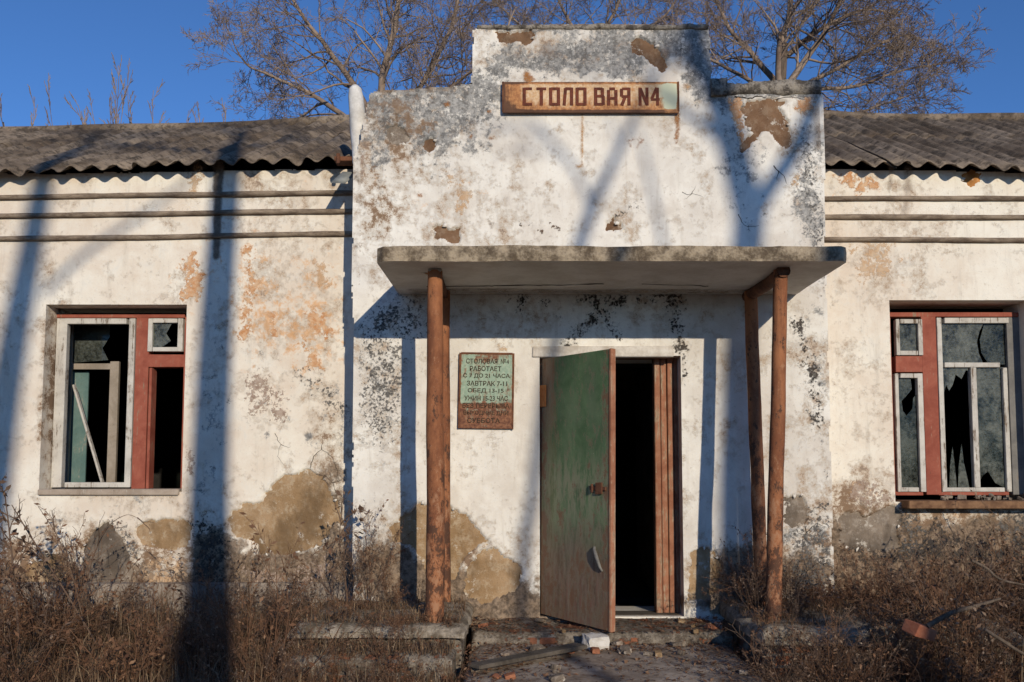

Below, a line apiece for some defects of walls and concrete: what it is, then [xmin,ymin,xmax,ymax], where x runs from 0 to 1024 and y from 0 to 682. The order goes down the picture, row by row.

spalling [495,30,535,46]
spalling [631,38,668,73]
spalling [728,97,816,153]
spalling [433,223,461,243]
spalling [605,218,622,231]
water stain [449,289,744,377]
water stain [294,292,427,452]
mould [789,315,824,434]
spalling [82,519,192,582]
spalling [228,469,343,582]
spalling [389,500,427,569]
spalling [450,507,522,604]